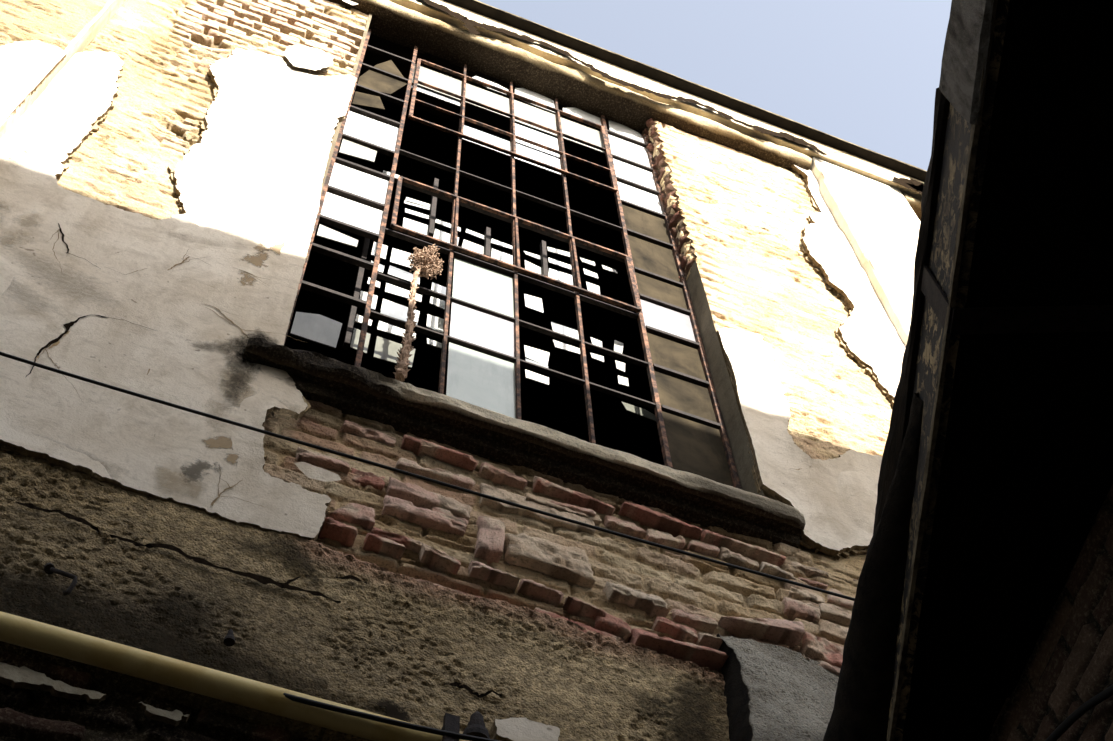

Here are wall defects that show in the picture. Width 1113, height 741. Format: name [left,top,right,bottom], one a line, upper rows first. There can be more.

spalling [0,0,369,220]
crack [48,220,268,285]
spalling [641,118,893,460]
crack [26,315,156,401]
crack [15,501,367,603]
spalling [263,399,866,676]
spalling [0,662,107,704]
spalling [136,701,190,726]